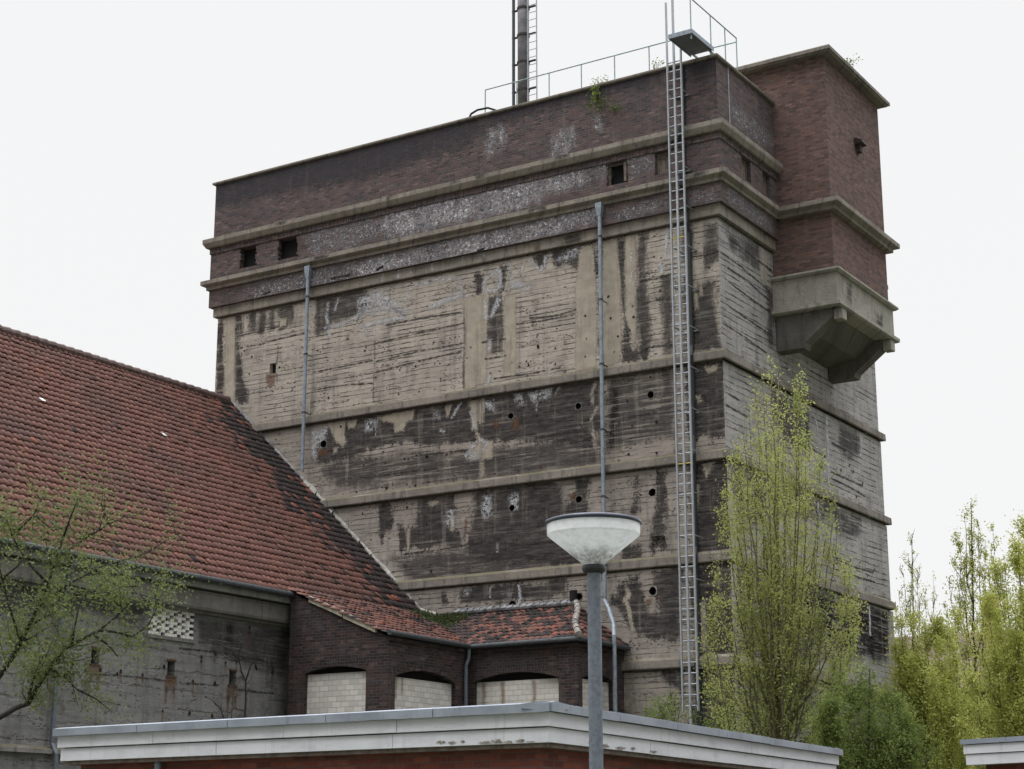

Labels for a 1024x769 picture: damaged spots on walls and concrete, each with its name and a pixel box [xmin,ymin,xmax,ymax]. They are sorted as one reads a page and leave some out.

water stain [255,165,774,606]
peeling [329,419,357,454]
peeling [468,398,493,477]